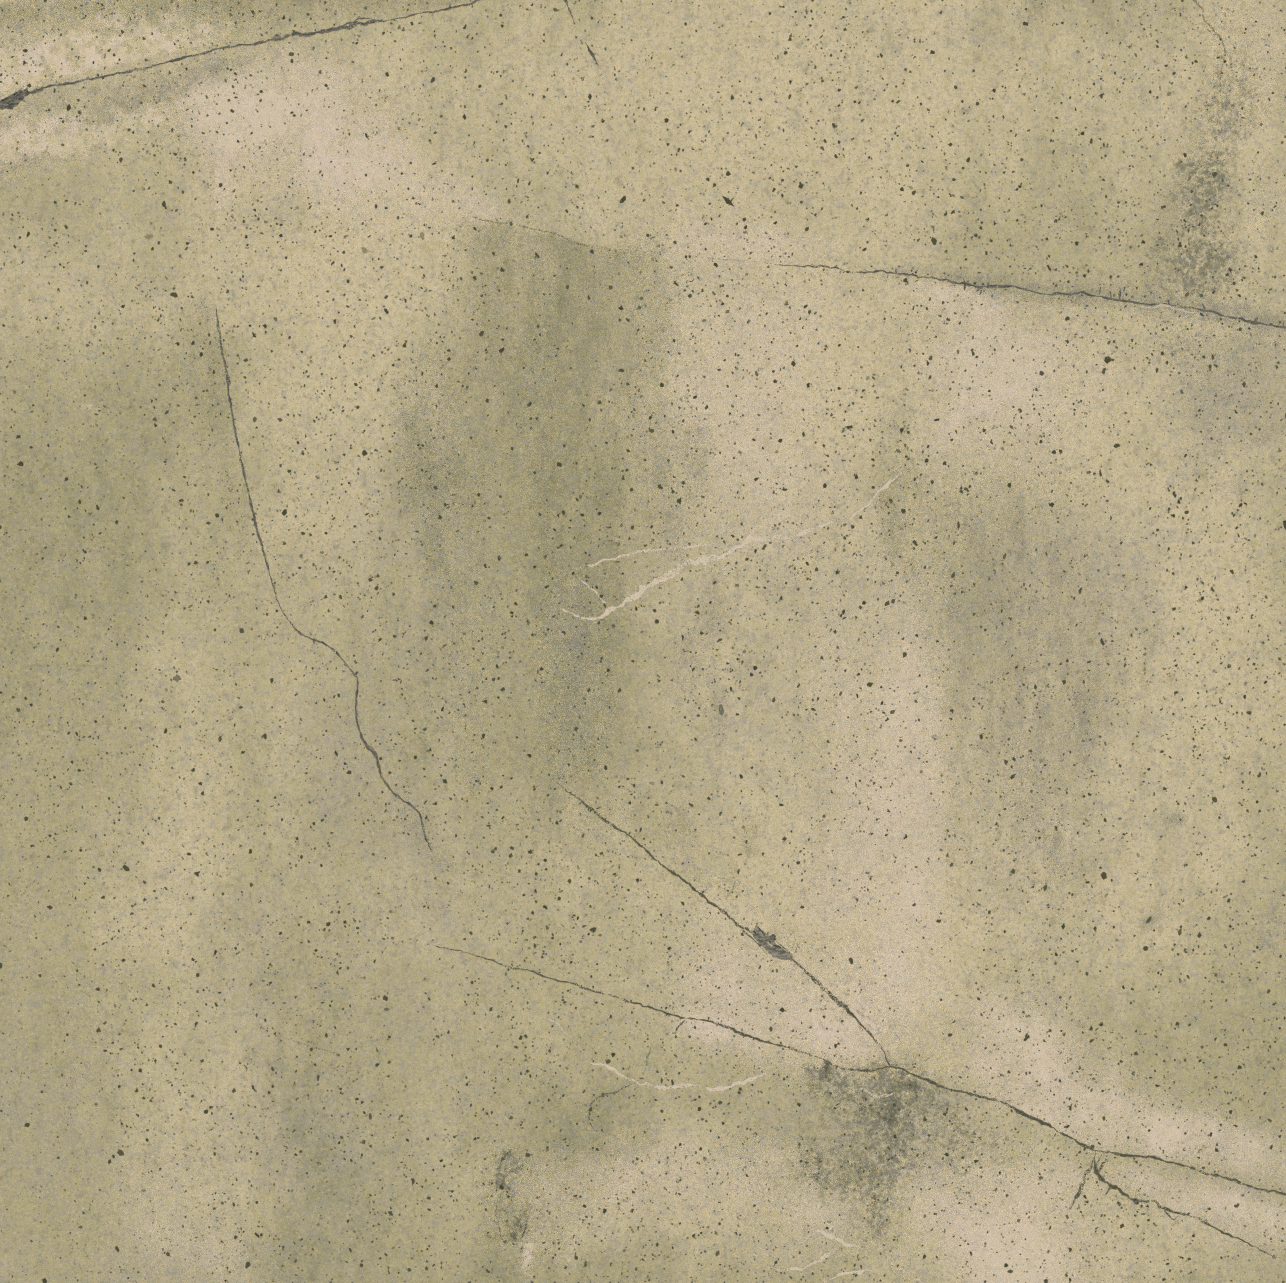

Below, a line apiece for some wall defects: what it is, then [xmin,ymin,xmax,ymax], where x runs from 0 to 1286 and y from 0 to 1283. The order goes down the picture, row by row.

crack [0,0,480,110]
crack [564,0,598,65]
crack [474,217,1286,345]
crack [216,308,438,852]
crack [426,779,1286,1258]